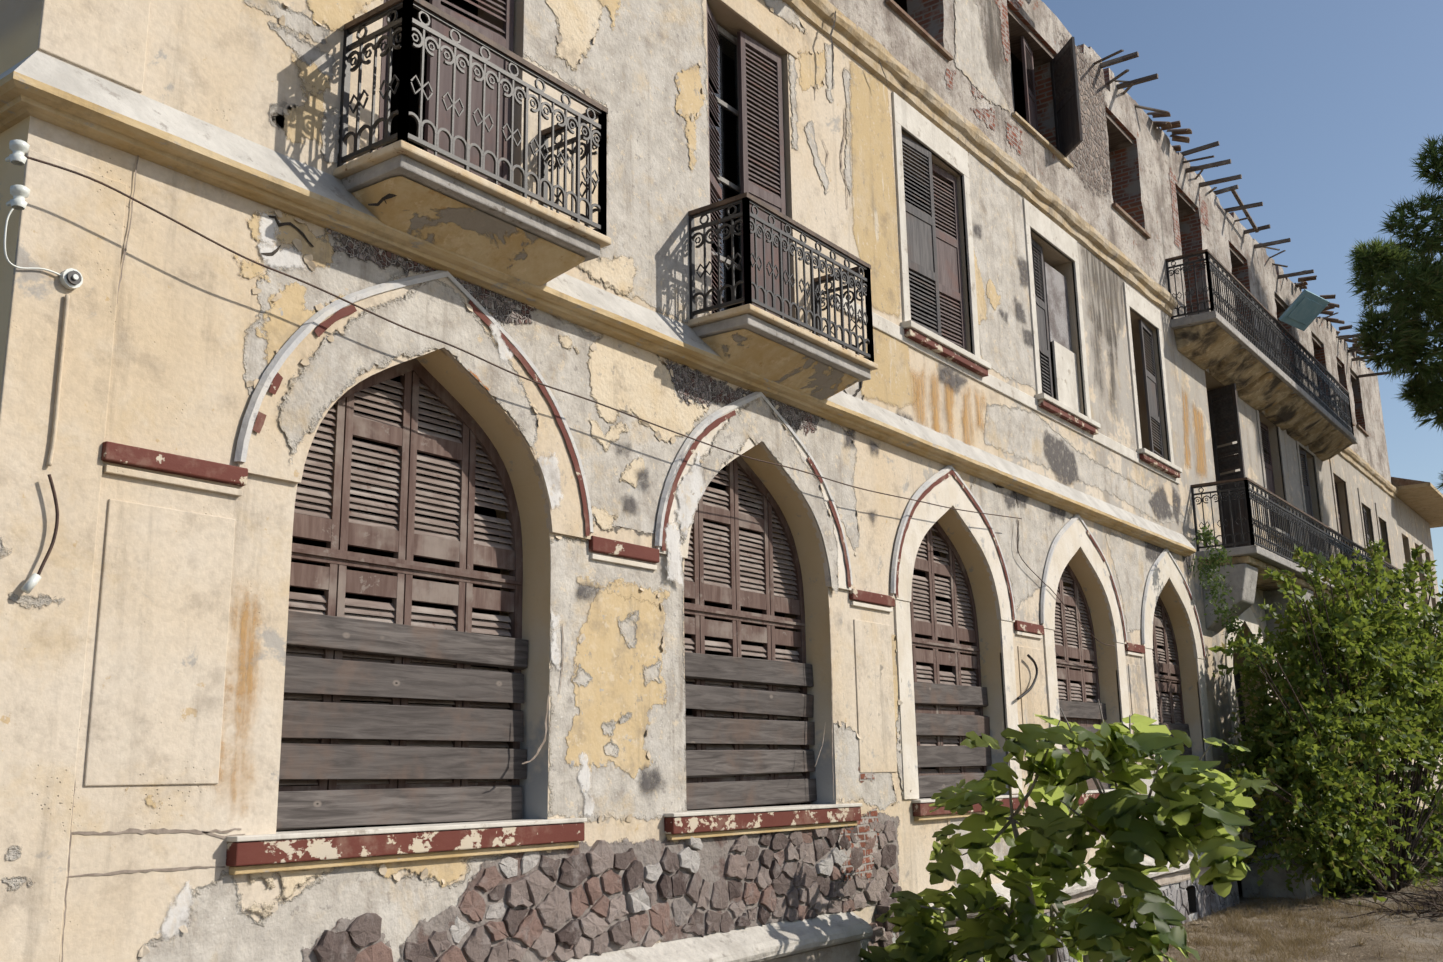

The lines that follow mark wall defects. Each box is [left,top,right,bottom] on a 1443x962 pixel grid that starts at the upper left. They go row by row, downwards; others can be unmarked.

crack [117,155,139,303]
crack [262,216,314,256]
flaking render [244,0,374,163]
flaking render [523,0,712,323]
flaking render [138,210,920,962]
crack [61,782,245,962]